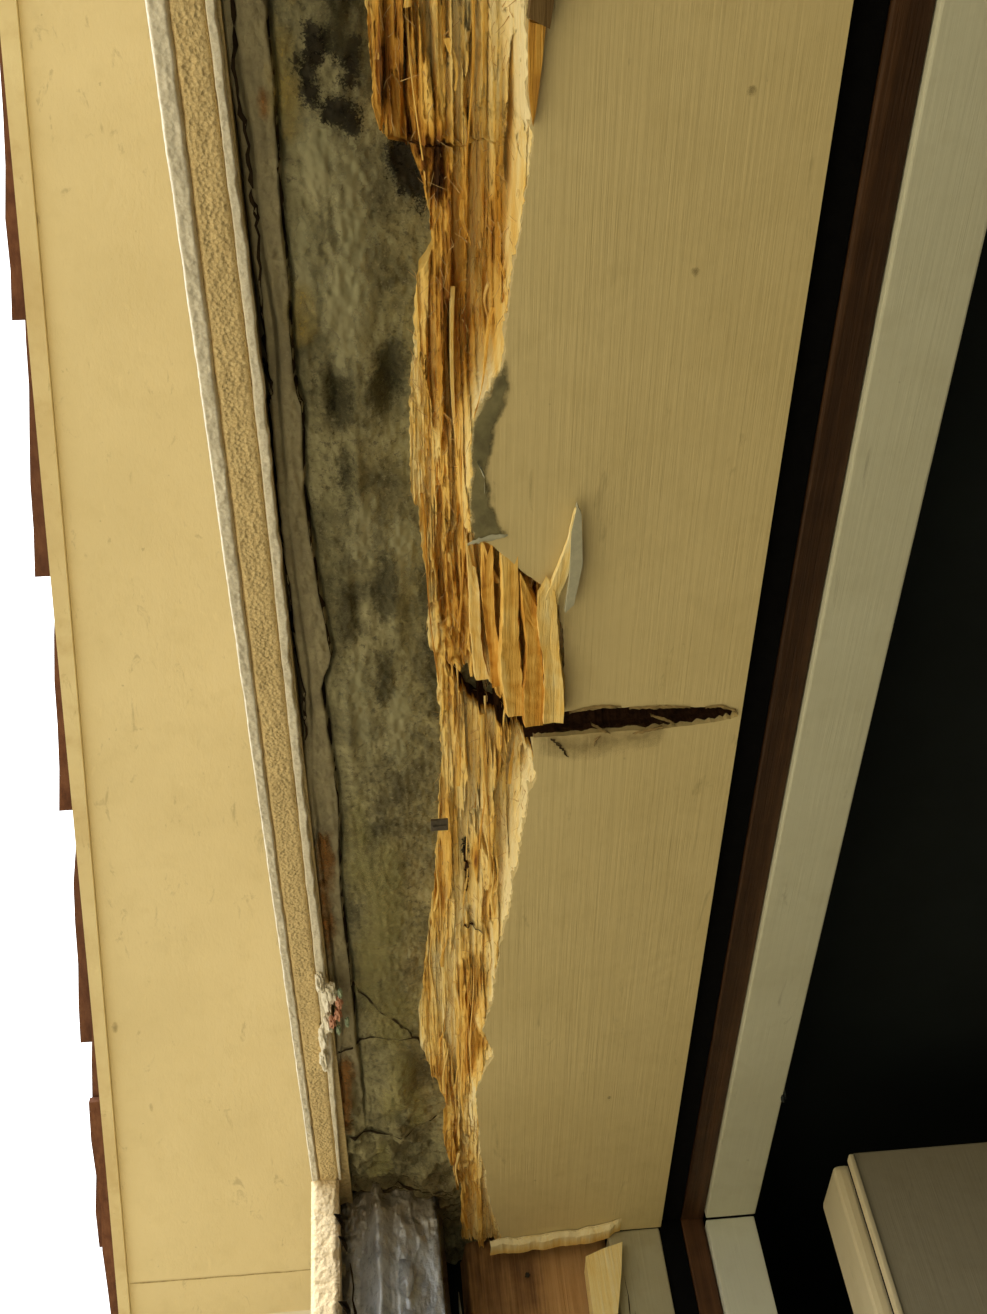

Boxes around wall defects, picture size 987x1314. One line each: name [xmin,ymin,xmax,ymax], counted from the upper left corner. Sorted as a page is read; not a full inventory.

peeling [526,0,554,126]
leakage [277,0,407,429]
leakage [380,139,429,220]
peeling [467,368,508,545]
leakage [340,453,440,714]
leakage [346,652,411,769]
crack [523,705,738,757]